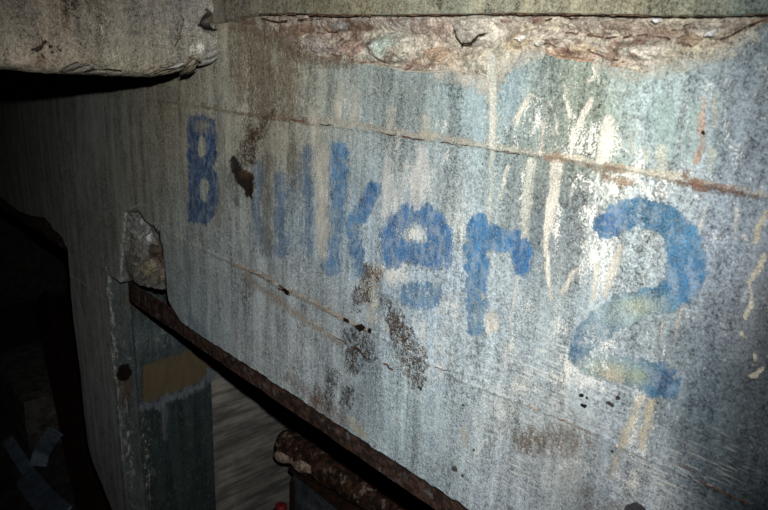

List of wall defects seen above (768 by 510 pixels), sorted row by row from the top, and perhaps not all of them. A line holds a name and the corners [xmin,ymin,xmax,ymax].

spalling [232,14,768,82]
spalling [122,210,166,290]
hole [229,155,257,199]
crack [240,267,293,296]
crack [159,98,768,199]
efflorescence [520,85,594,301]
efflorescence [596,114,616,165]
damp [734,206,768,245]
damp [743,253,767,320]
crack [315,304,393,370]